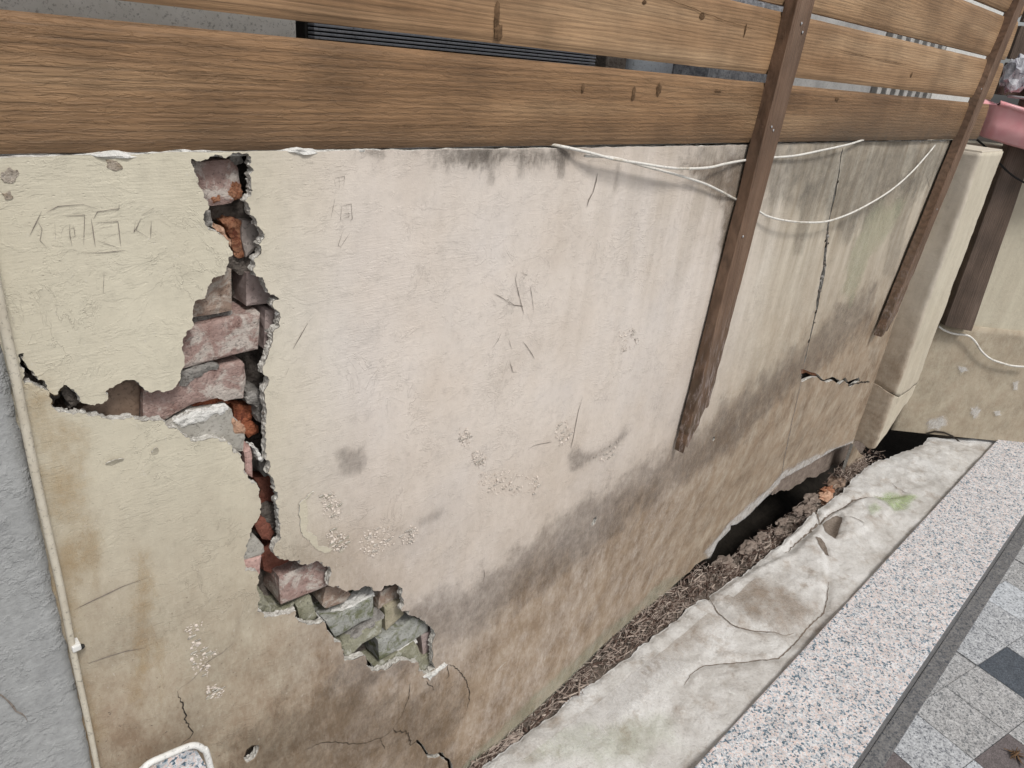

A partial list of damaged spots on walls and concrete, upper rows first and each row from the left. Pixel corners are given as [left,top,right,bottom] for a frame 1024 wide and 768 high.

spalling [106,160,123,171]
crack [808,180,839,343]
crack [18,156,470,763]
flaking render [298,490,419,557]
spalling [672,460,845,588]
leakage [708,450,833,556]
spalling [860,429,934,466]
peeling [184,621,225,700]
crack [685,582,829,684]